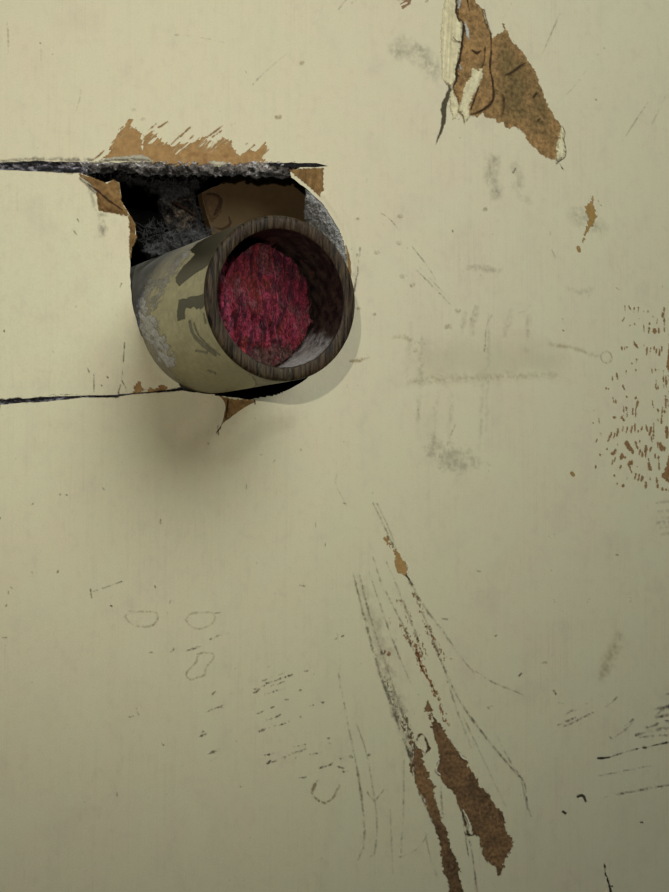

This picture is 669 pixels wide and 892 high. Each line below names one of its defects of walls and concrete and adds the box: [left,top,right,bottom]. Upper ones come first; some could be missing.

peeling [59,119,299,286]
spalling [304,189,347,265]
peeling [177,294,204,321]
crack [0,381,184,405]
spalling [215,377,308,400]
peeling [595,342,669,491]
spalling [383,536,514,892]